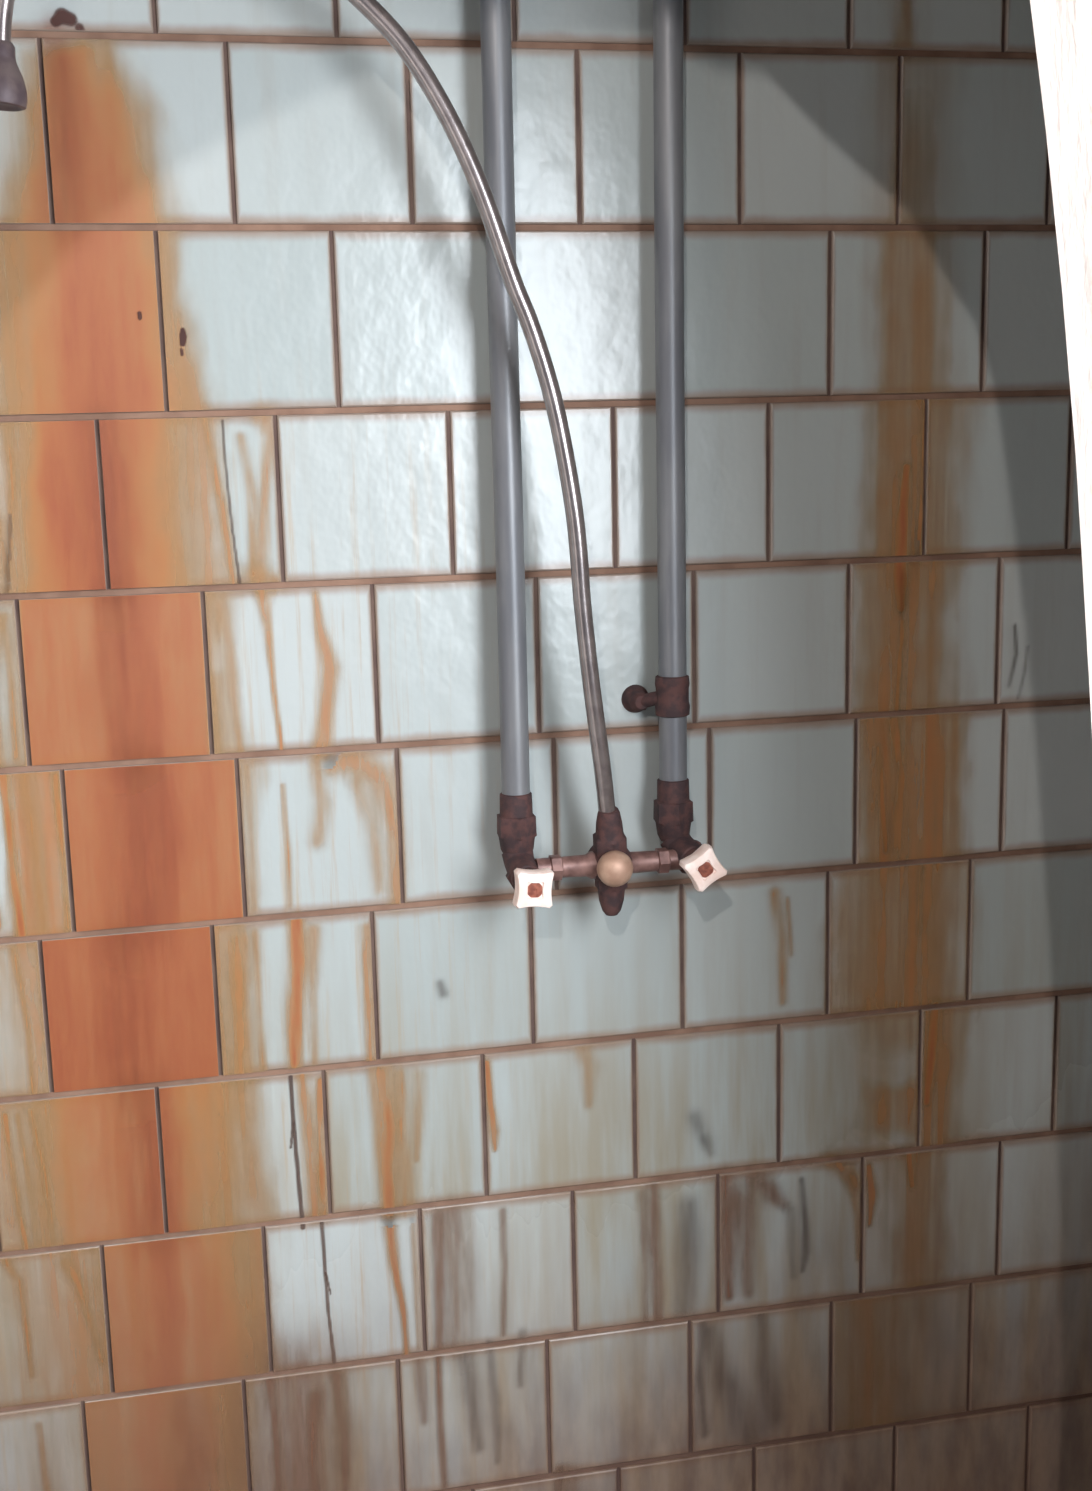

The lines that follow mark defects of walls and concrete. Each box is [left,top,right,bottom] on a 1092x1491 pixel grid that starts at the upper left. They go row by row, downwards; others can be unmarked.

corrosion [0,44,348,1491]
corrosion [314,592,401,904]
corrosion [363,925,418,1355]
corrosion [485,1060,498,1151]
corrosion [435,1213,456,1487]